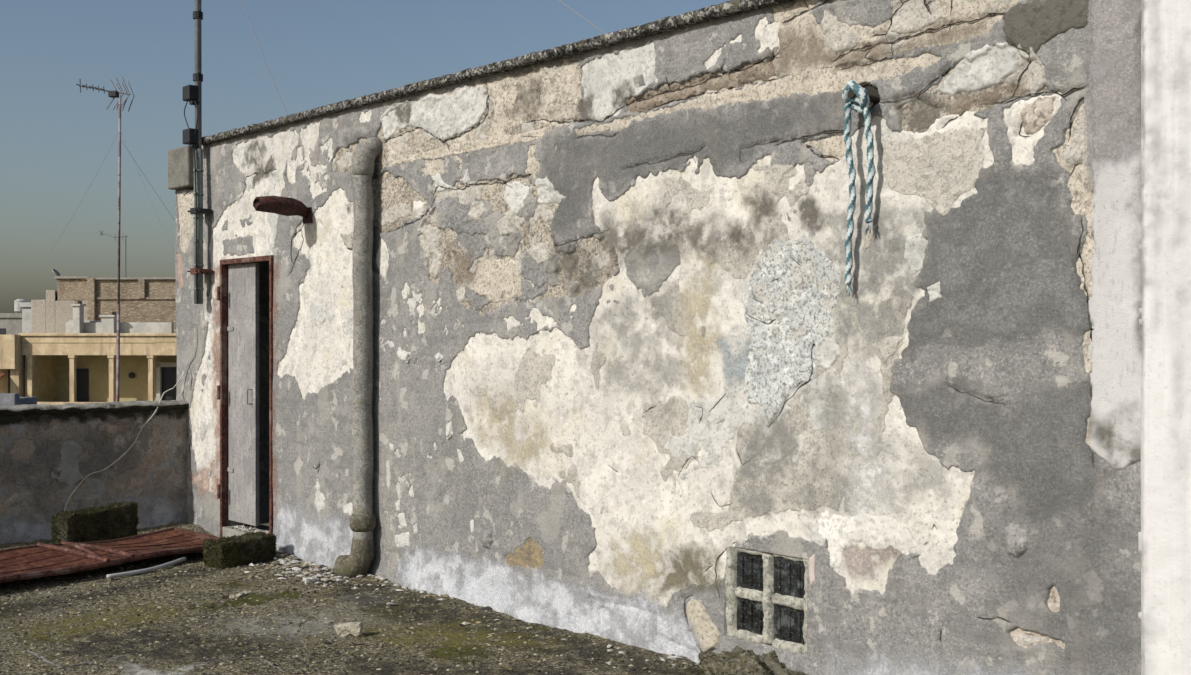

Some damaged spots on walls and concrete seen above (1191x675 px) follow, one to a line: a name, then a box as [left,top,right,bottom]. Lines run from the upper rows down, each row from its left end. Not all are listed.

crack [831,0,1087,175]
flaking render [177,192,194,291]
peeling [188,0,1065,652]
peeling [1053,103,1095,300]
crack [1077,219,1093,340]
peeling [1082,329,1094,375]
leakage [329,443,700,675]